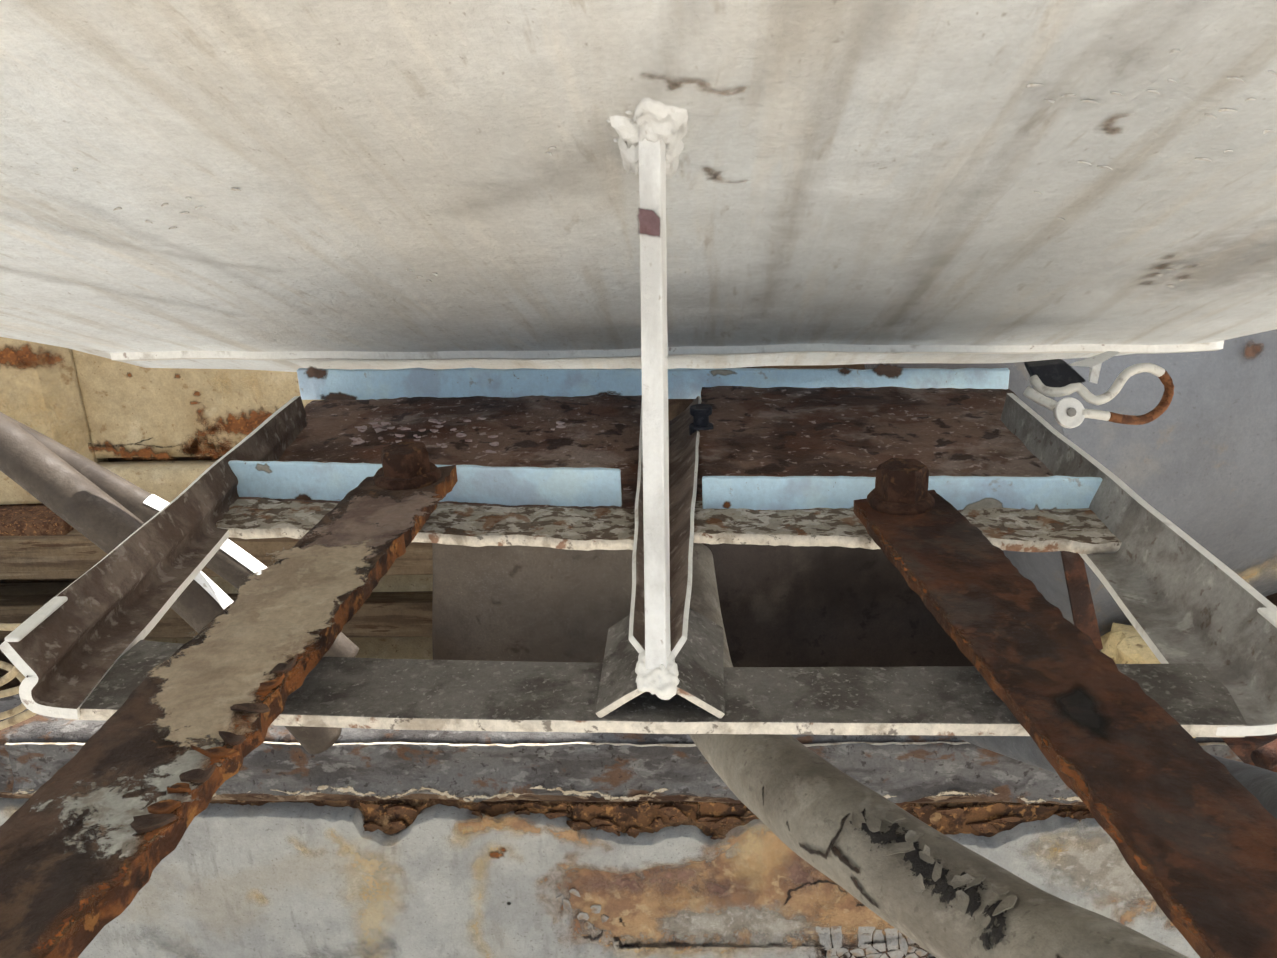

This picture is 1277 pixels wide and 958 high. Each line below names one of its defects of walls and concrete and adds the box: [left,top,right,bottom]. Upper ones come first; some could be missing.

corrosion [649,76,743,94]
corrosion [88,391,278,463]
corrosion [0,441,458,958]
corrosion [853,458,1277,958]
corrosion [455,816,908,952]
crack [762,787,878,908]